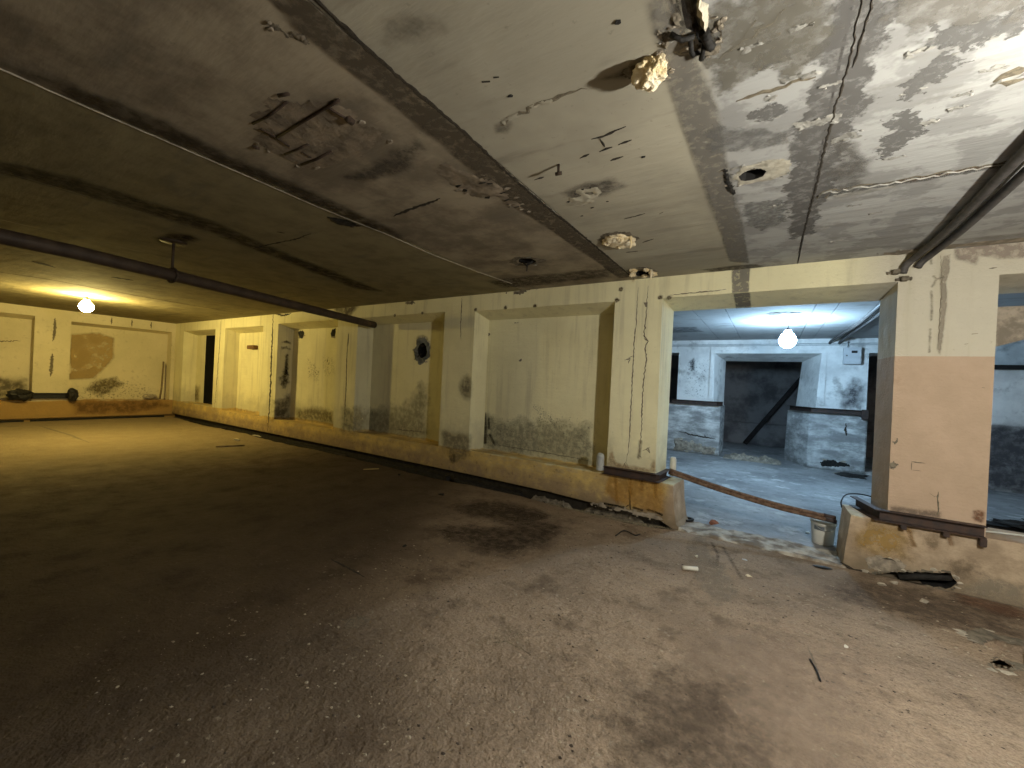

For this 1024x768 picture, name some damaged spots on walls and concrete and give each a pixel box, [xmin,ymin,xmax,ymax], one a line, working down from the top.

peeling [799,70,843,90]
peeling [874,6,1024,161]
spalling [249,92,393,170]
peeling [747,95,788,122]
crack [798,0,873,253]
spalling [720,165,746,196]
spalling [566,184,609,217]
leakage [85,378,147,398]
crack [624,292,650,468]
leakage [843,384,862,408]
leakage [442,501,559,554]
spalling [861,555,964,591]